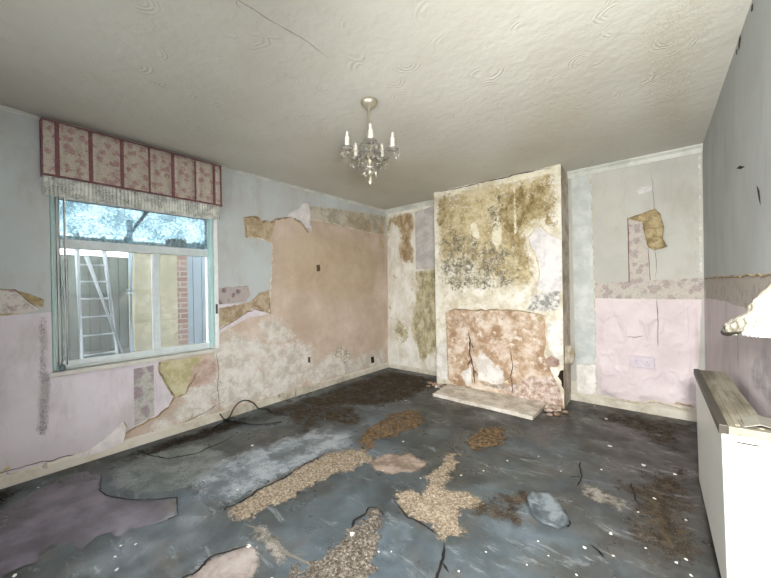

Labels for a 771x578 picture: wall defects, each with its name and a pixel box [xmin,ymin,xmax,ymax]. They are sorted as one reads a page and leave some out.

crack [236,0,327,57]
damp [289,127,558,362]
flaking render [124,202,388,440]
flaking render [437,308,564,409]
crack [435,545,449,578]